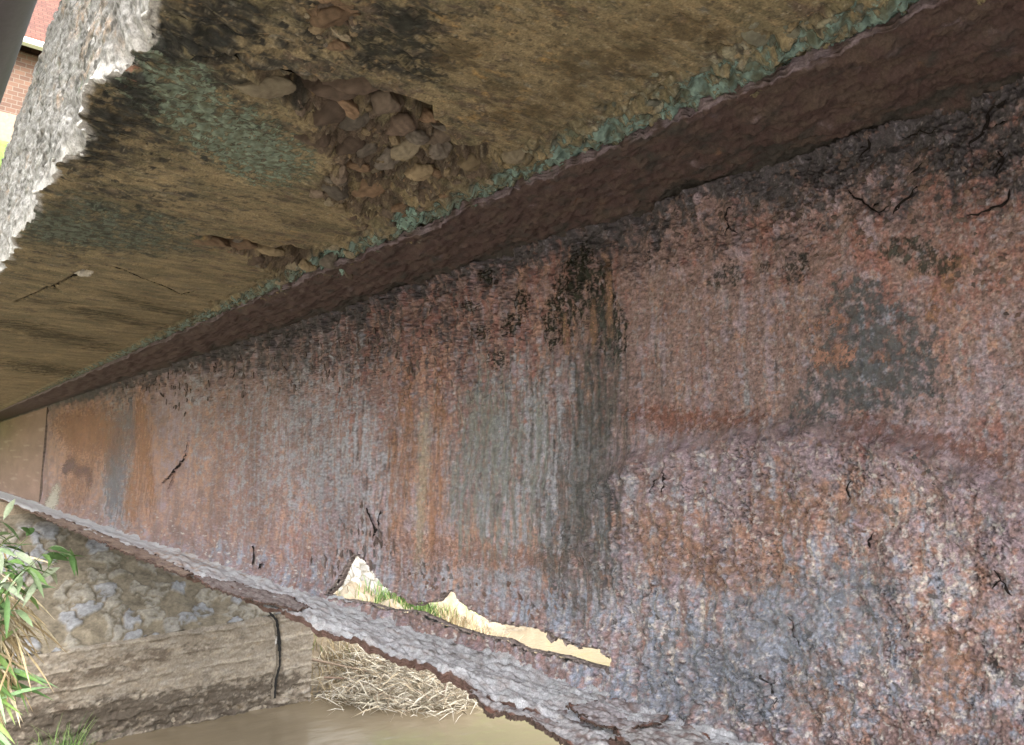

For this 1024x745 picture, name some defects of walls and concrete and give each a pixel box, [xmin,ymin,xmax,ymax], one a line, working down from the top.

leakage [76,0,268,169]
spalling [234,71,505,229]
crack [848,162,923,215]
corrosion [911,154,1014,322]
leakage [541,240,629,364]
crack [163,445,187,485]
corrosion [34,511,312,613]
corrosion [310,500,395,582]
corrosion [408,561,486,597]
crack [269,612,281,698]
corrosion [623,602,693,659]
corrosion [469,689,729,745]